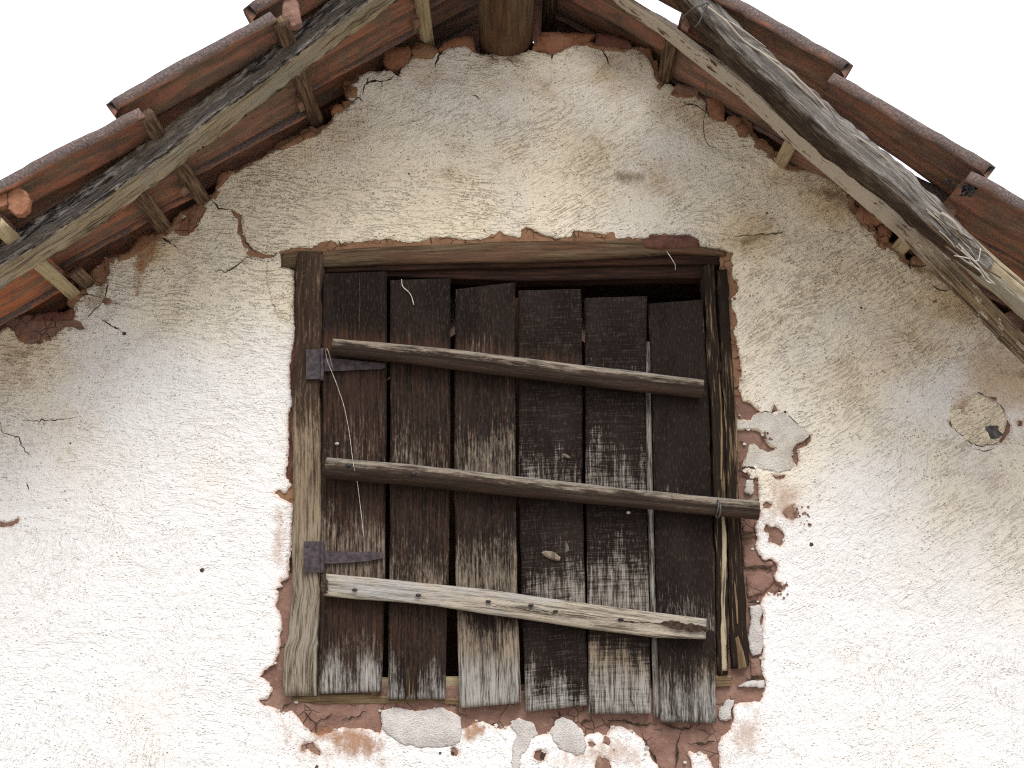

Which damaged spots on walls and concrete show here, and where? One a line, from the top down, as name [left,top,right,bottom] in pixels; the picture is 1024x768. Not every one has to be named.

flaking render [0,73,363,345]
crack [212,201,277,273]
flaking render [279,227,668,256]
crack [1,417,75,453]
flaking render [791,435,810,465]
flaking render [260,503,812,768]